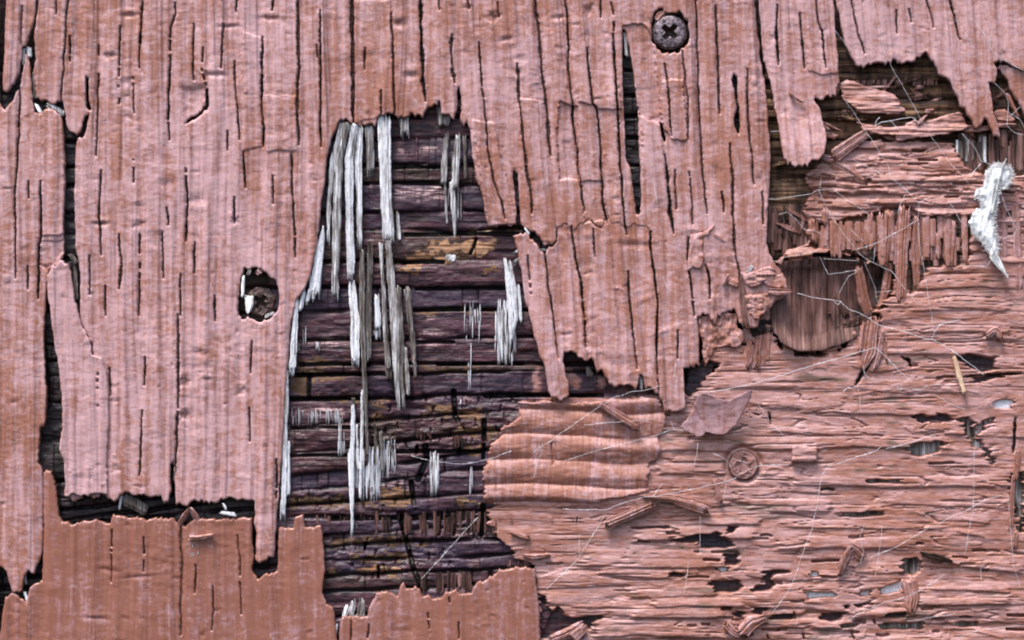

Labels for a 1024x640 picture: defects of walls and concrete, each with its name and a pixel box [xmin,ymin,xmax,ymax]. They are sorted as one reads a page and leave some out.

crack [1,7,42,298]
crack [56,0,71,104]
crack [89,3,195,469]
crack [167,2,265,221]
crack [272,2,322,257]
crack [479,47,504,213]
crack [517,0,763,371]
peeling [268,37,1024,640]